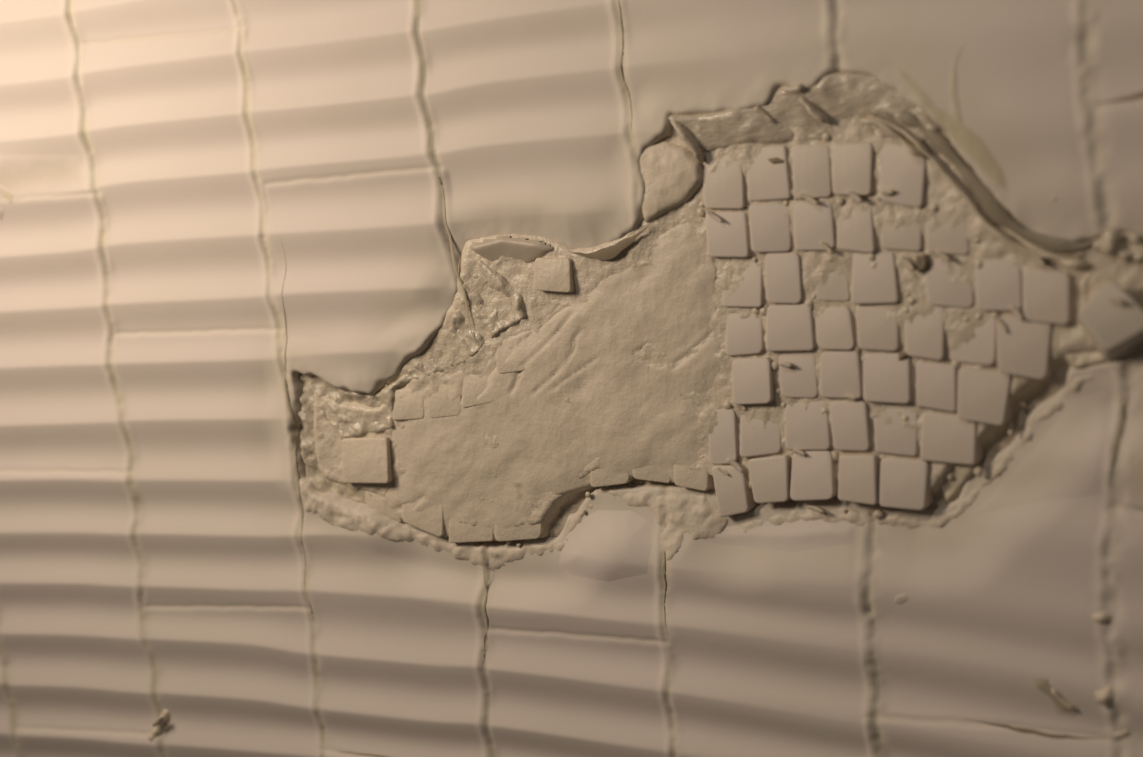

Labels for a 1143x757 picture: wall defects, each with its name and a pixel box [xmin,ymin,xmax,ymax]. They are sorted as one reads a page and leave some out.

crack [1097,91,1143,104]
spalling [298,72,1143,572]
crack [968,719,1100,739]
crack [339,749,390,757]